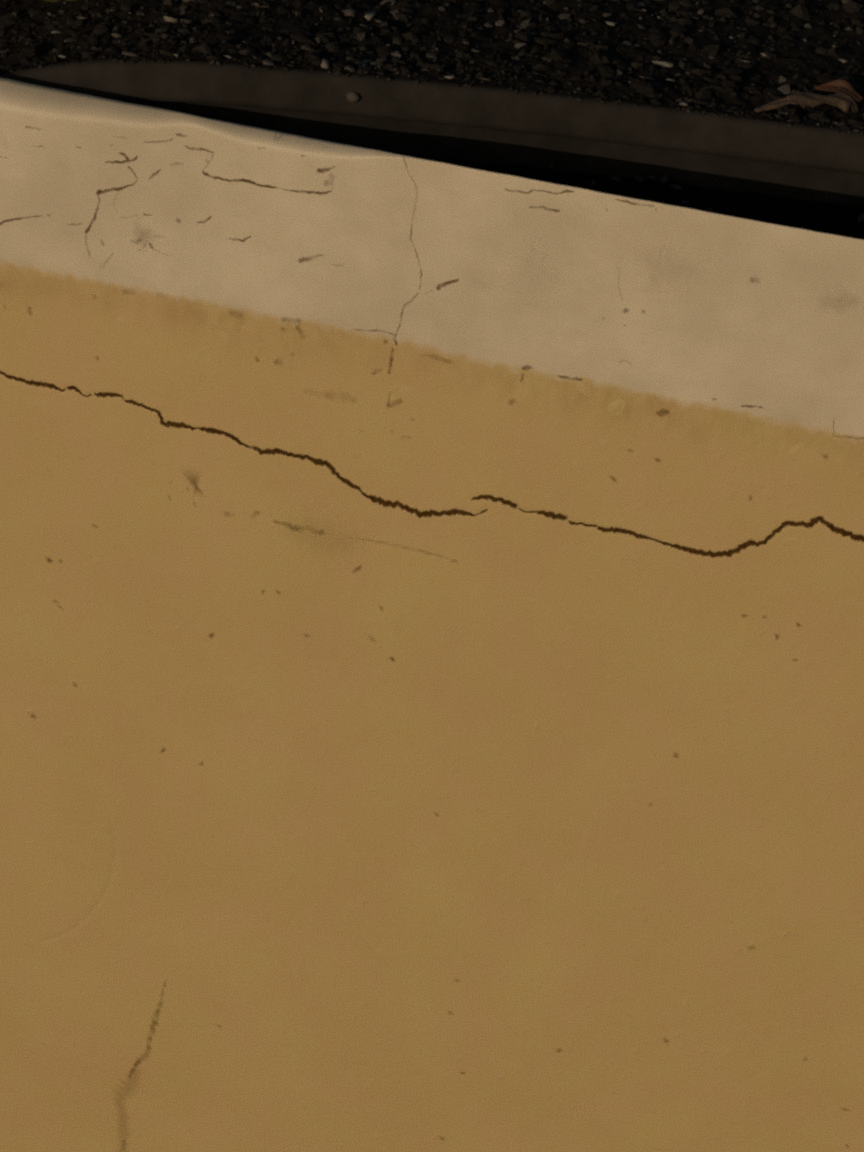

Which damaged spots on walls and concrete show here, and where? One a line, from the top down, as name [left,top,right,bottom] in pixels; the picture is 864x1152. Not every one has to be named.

crack [85,152,155,233]
crack [200,148,330,195]
crack [0,371,864,557]